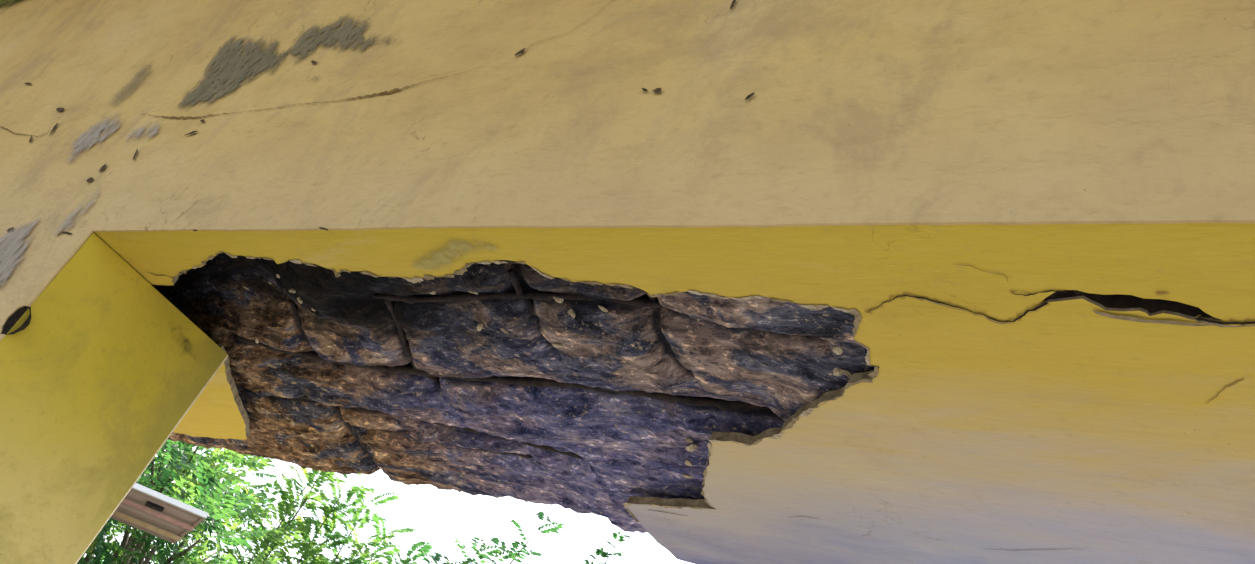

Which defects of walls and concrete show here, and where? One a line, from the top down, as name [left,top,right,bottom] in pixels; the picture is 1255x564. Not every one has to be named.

spalling [151,242,879,533]
crack [865,264,1255,327]